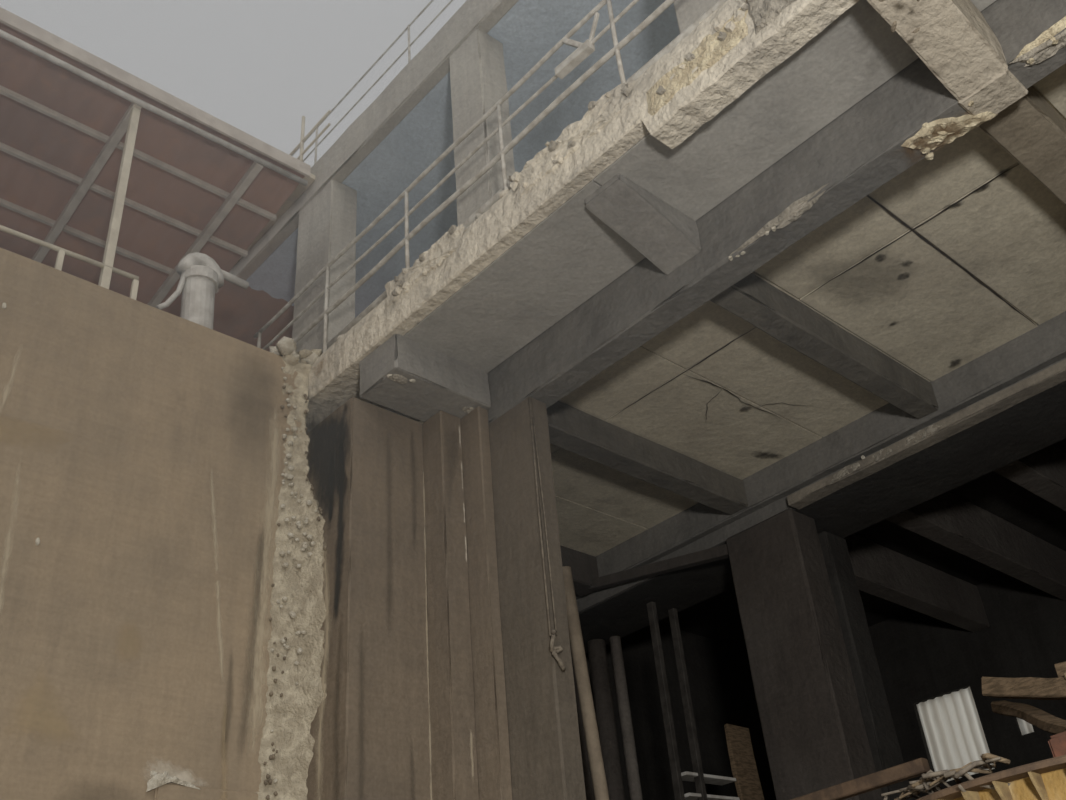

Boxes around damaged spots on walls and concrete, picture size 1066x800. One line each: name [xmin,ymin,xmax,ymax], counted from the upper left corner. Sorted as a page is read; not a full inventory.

spalling [646,0,797,116]
spalling [1009,16,1066,67]
spalling [508,81,636,199]
spalling [901,101,998,160]
spalling [385,224,464,309]
spalling [728,183,829,261]
crack [804,163,1033,323]
water stain [306,406,348,616]
spalling [253,359,328,800]
spalling [146,766,200,792]